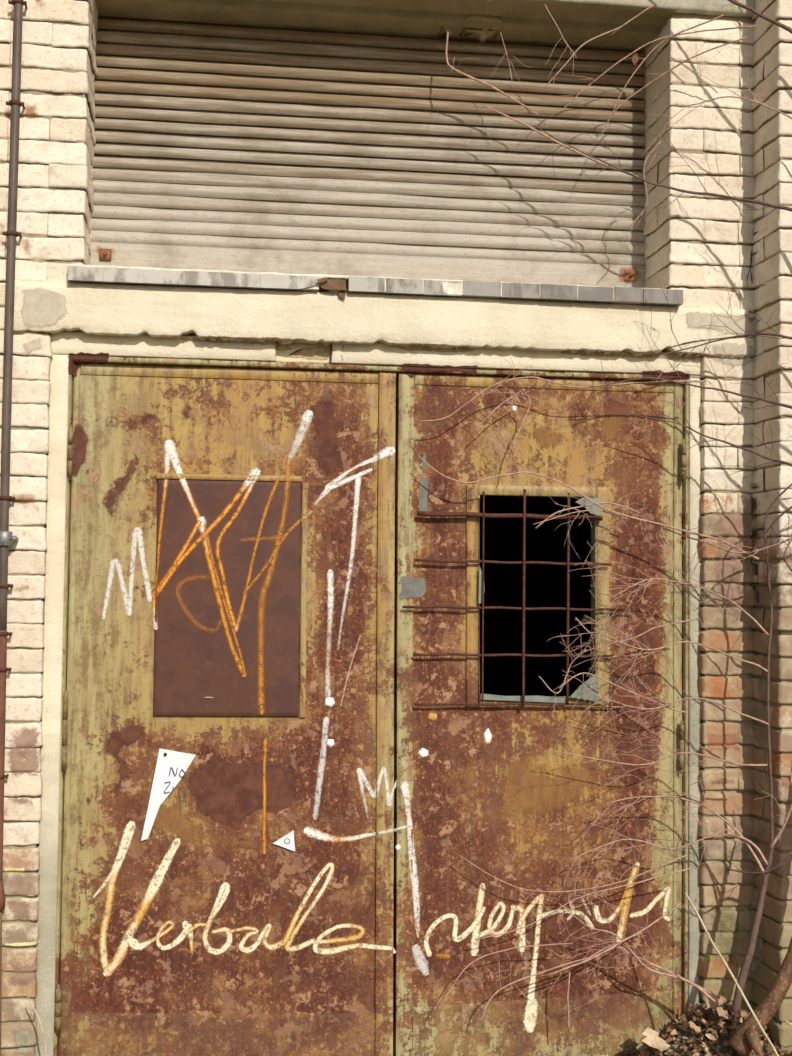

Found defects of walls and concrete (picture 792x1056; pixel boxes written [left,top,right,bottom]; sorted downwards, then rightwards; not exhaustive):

rust [68,352,109,377]
rust [402,363,478,378]